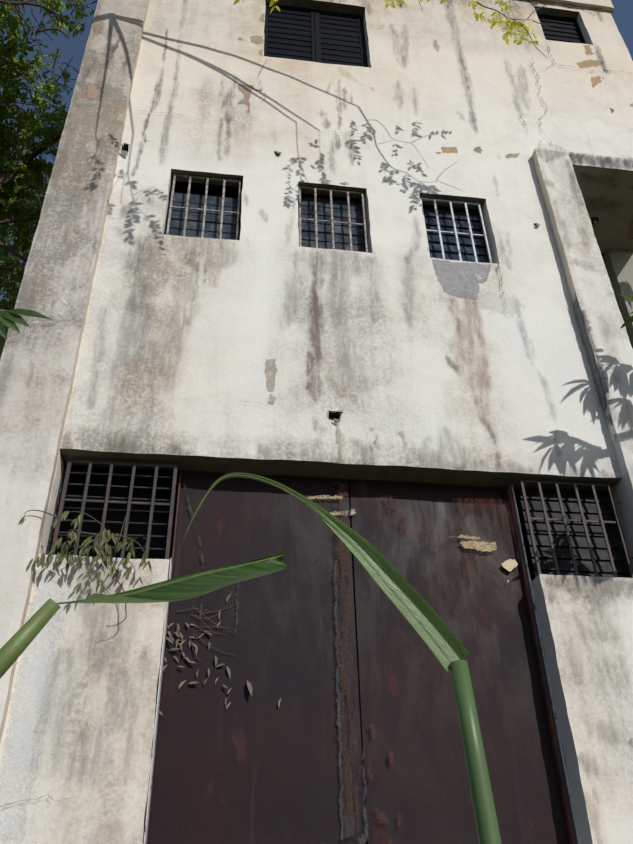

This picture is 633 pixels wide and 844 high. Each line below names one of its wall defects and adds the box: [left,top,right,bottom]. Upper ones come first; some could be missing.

peeling [577,45,604,88]
peeling [238,84,262,113]
crack [520,43,630,145]
flaking render [432,259,490,300]
water stain [307,256,323,400]
peeling [265,359,278,404]